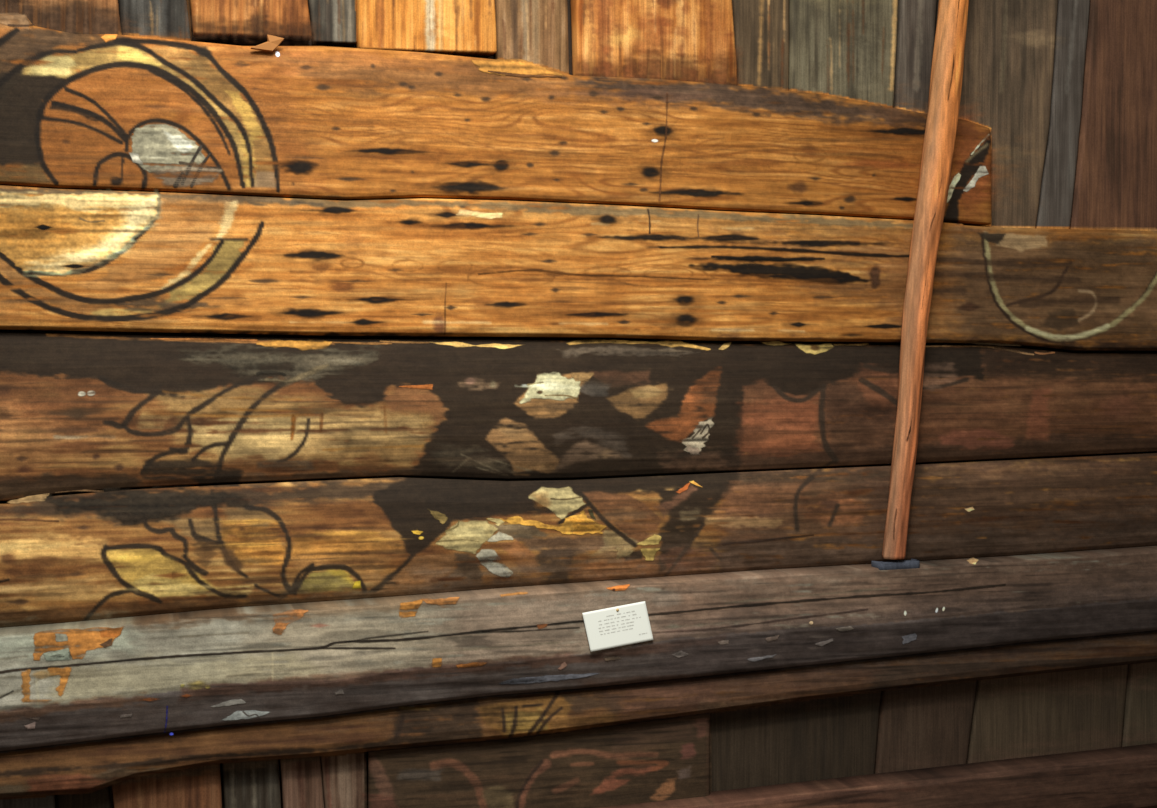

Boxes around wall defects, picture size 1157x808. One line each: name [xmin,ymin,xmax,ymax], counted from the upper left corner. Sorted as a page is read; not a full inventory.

peeling [947,166,989,202]
peeling [520,373,594,404]
peeling [682,419,714,454]
peeling [412,487,606,577]
peeling [616,535,661,561]
crack [648,584,1006,633]
peeling [21,627,123,702]
crack [0,620,584,698]